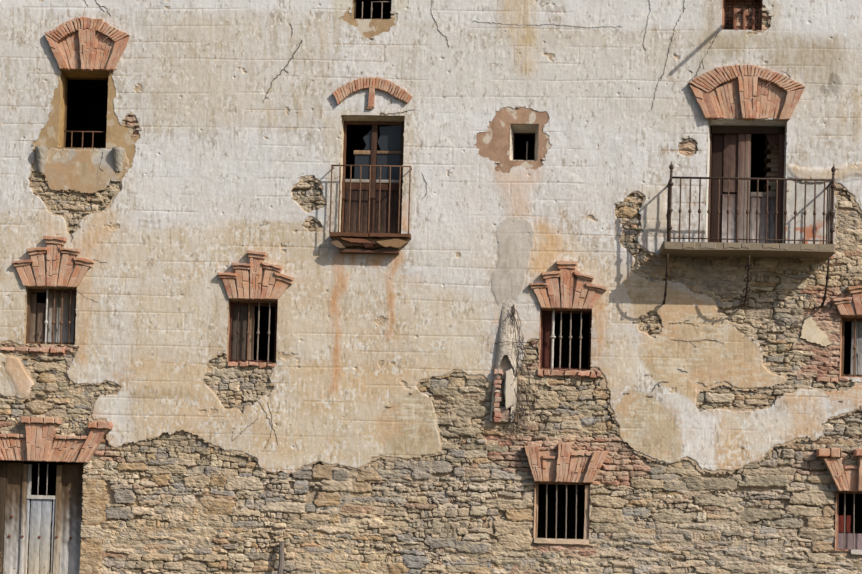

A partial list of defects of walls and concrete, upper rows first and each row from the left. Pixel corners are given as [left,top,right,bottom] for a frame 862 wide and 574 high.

crack [263,23,303,103]
peeling [339,7,398,41]
crack [652,0,686,109]
crack [689,32,719,80]
peeling [29,67,142,237]
peeling [474,106,553,173]
spalling [291,176,327,231]
rust [327,247,407,398]
spalling [376,177,862,477]
spalling [0,343,119,445]
spalling [203,354,275,413]
spalling [92,430,255,462]